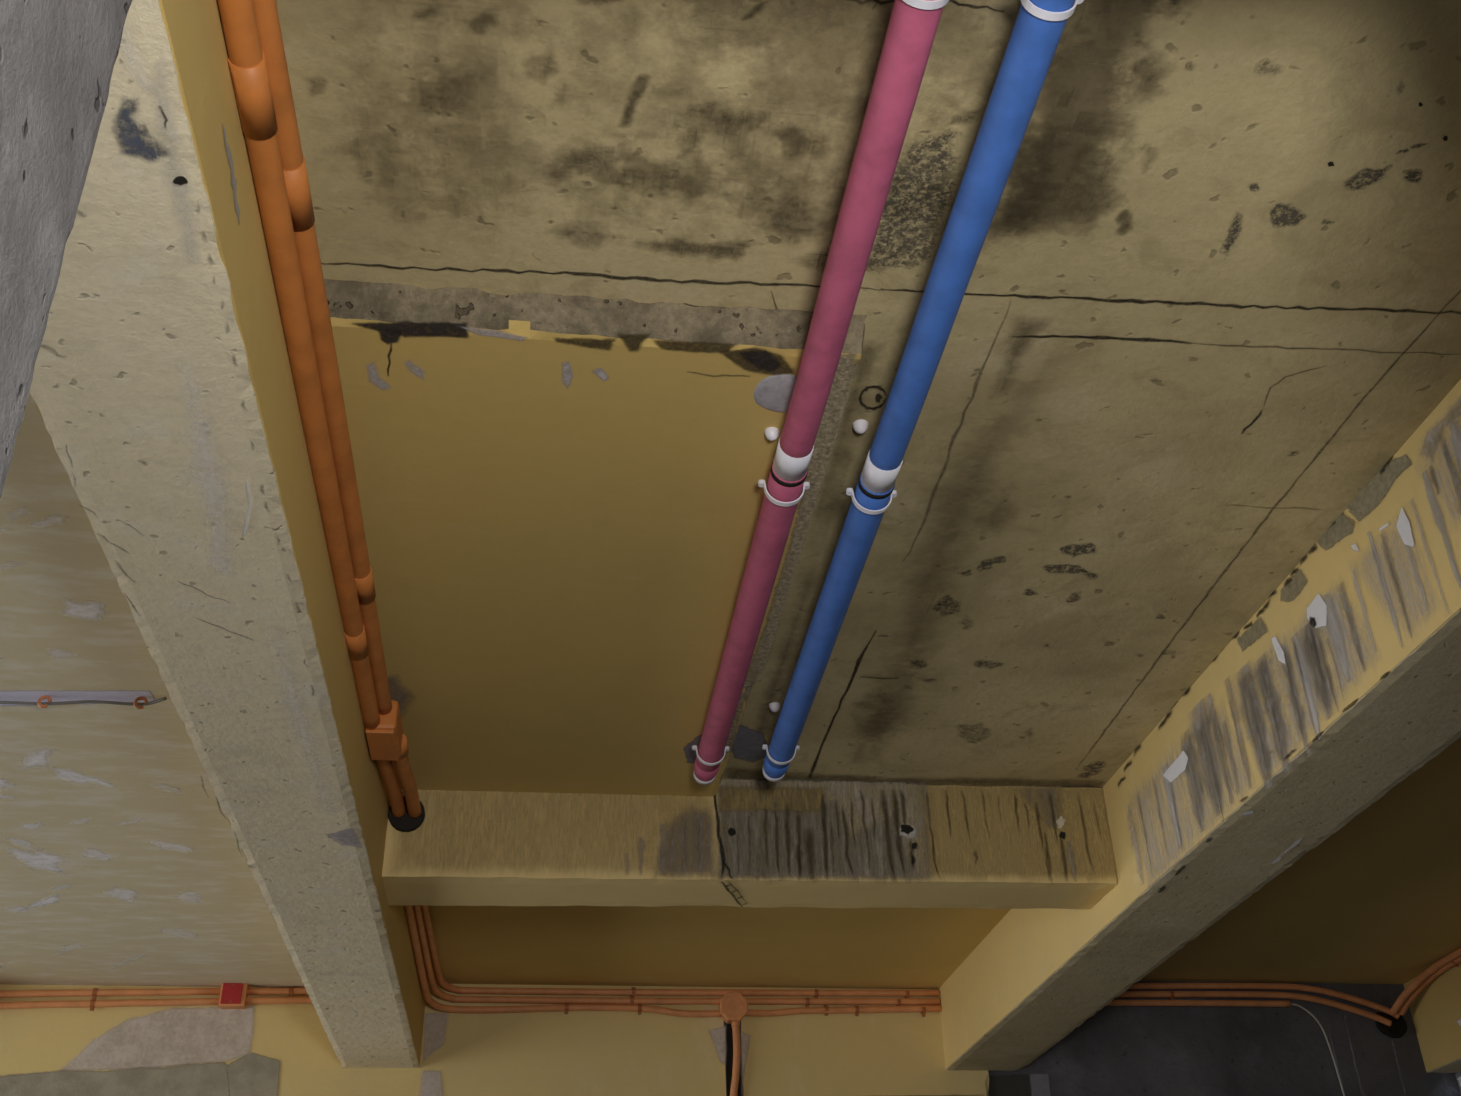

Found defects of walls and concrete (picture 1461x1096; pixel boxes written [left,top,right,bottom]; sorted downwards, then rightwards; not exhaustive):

crack [949,0,998,11]
water stain [867,117,964,270]
crack [322,263,820,308]
spalling [354,321,468,375]
spalling [556,334,793,377]
water stain [1044,543,1101,592]
crack [913,291,1461,744]
peeling [1233,455,1414,664]
water stain [1129,398,1461,880]
crack [809,633,892,778]
water stain [405,761,1116,878]
spalling [1163,751,1188,782]